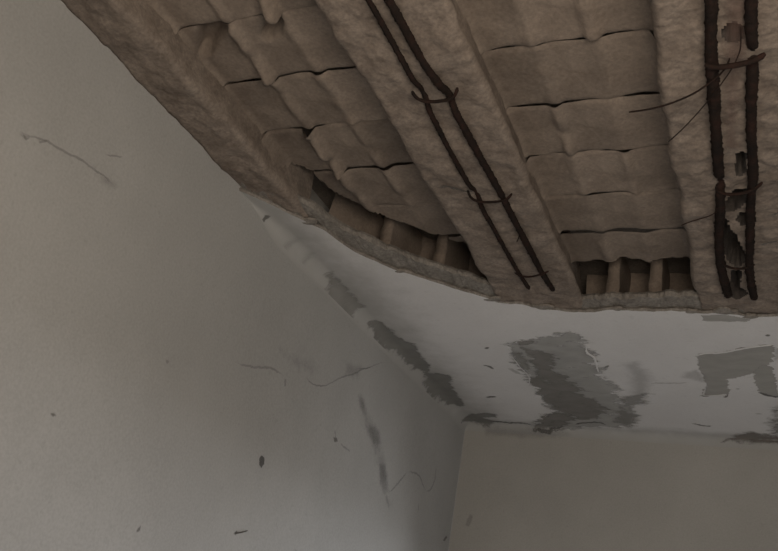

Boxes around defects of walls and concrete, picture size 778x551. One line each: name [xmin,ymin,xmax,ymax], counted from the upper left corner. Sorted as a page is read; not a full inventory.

spalling [721,21,745,43]
spalling [734,151,748,176]
flaking render [238,182,778,322]
peeling [508,332,645,431]
peeling [696,335,778,398]